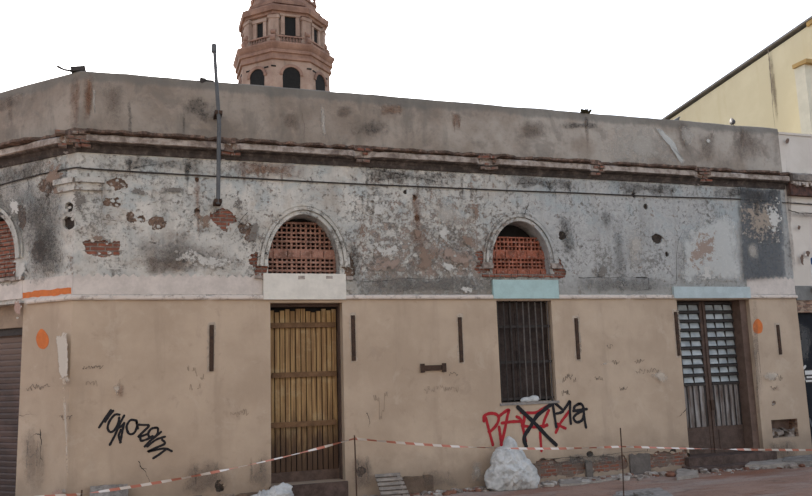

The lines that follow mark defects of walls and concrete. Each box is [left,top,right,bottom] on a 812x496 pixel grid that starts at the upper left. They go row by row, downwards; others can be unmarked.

peeling [38,147,91,230]
flaking render [79,231,120,257]
flaking render [103,177,185,230]
flaking render [174,194,269,275]
flaking render [341,251,356,276]
peeling [356,190,413,278]
peeling [426,189,490,276]
peeling [683,231,722,284]
peeling [739,197,785,243]
flaking render [533,451,627,480]
flaking render [650,446,688,471]